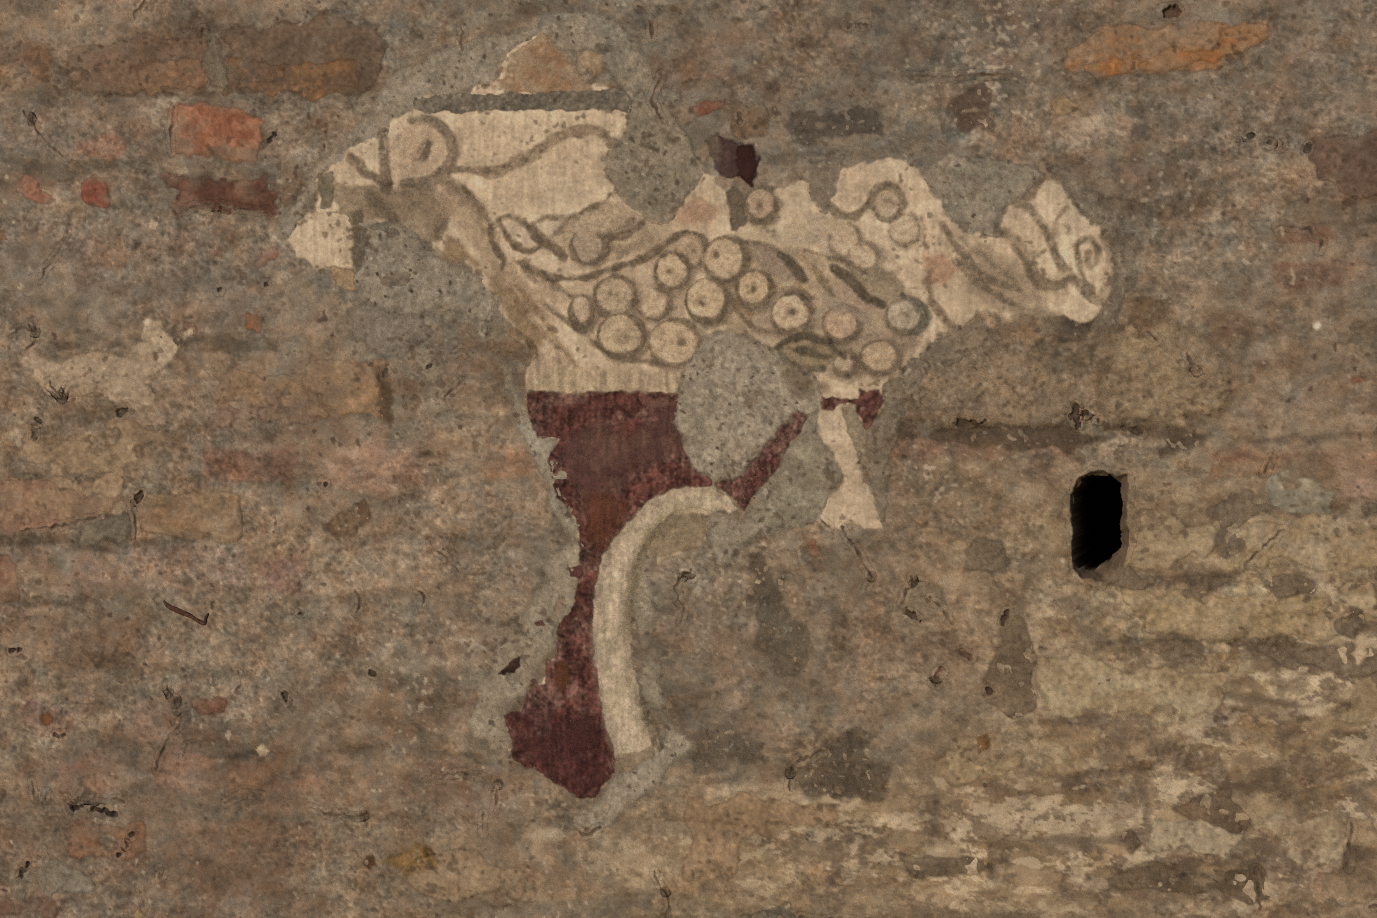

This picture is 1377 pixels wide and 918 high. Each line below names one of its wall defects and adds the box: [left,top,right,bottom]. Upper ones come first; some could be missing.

peeling [690,101,769,187]